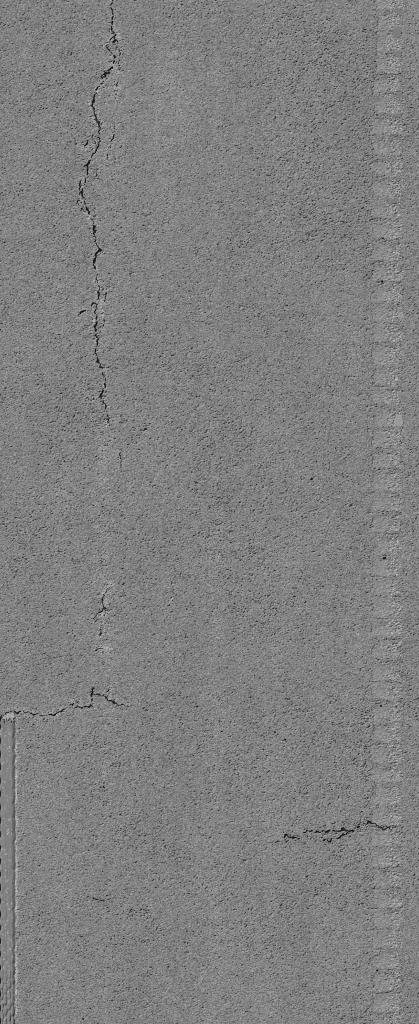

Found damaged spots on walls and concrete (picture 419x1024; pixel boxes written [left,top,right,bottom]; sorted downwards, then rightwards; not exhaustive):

crack [77,0,121,423]
crack [0,688,129,718]
crack [277,821,391,843]